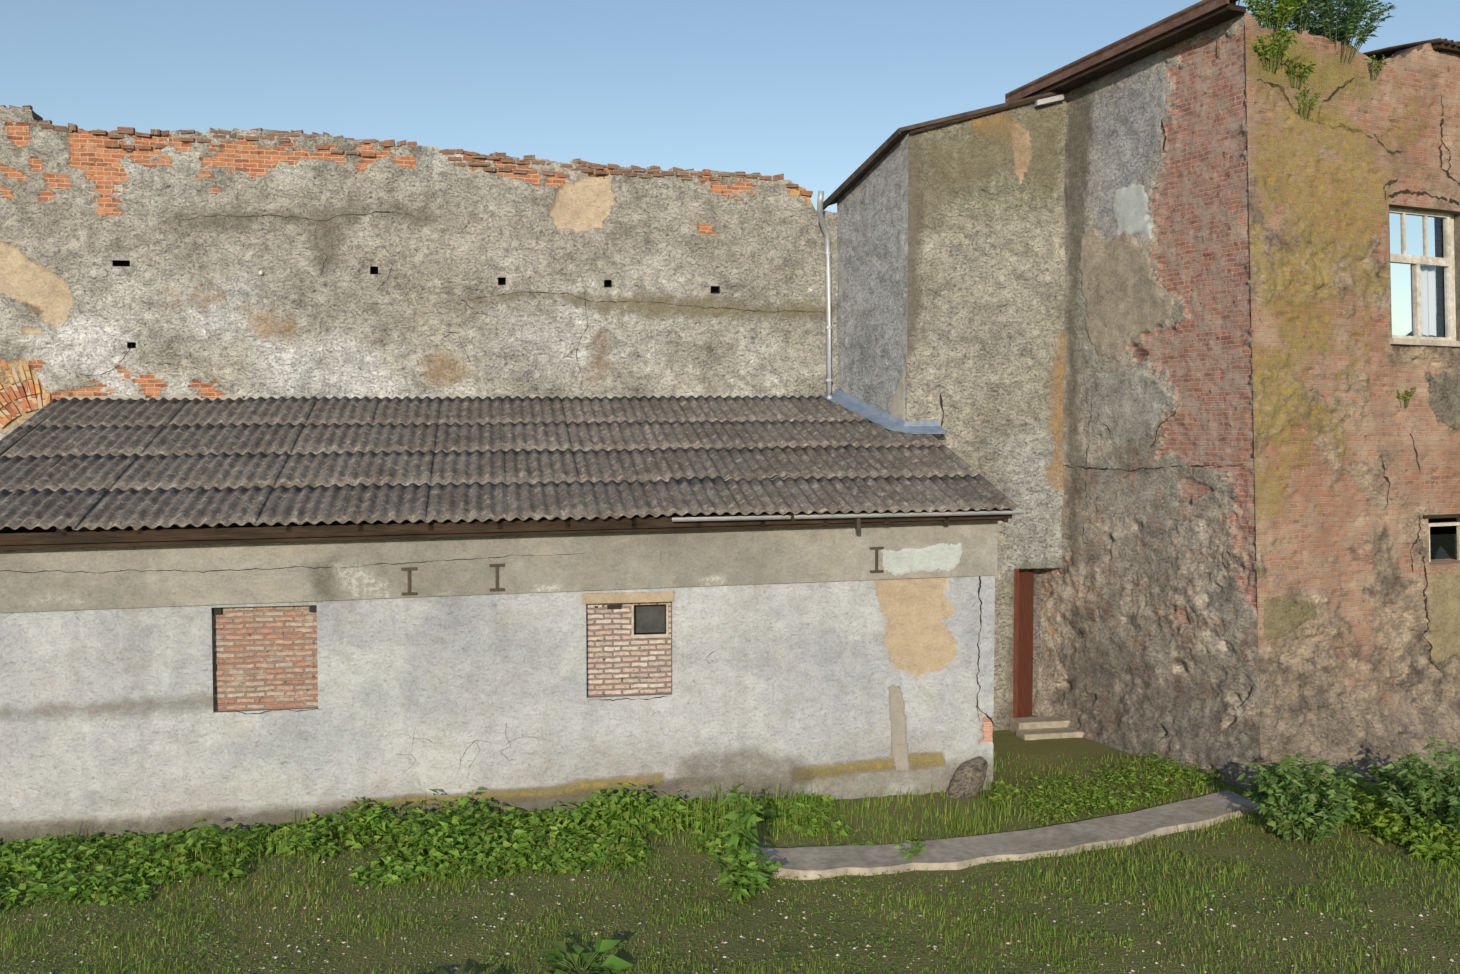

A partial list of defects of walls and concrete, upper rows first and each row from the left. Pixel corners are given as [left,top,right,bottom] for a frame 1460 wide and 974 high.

flaking render [0,120,415,215]
flaking render [463,151,615,233]
flaking render [698,224,716,235]
flaking render [698,169,758,201]
flaking render [785,183,812,205]
crack [1257,78,1460,184]
flaking render [28,359,44,370]
flaking render [0,241,74,337]
flaking render [1126,27,1317,641]
flaking render [1424,368,1460,430]
crack [1381,433,1441,671]
peeling [874,577,958,677]